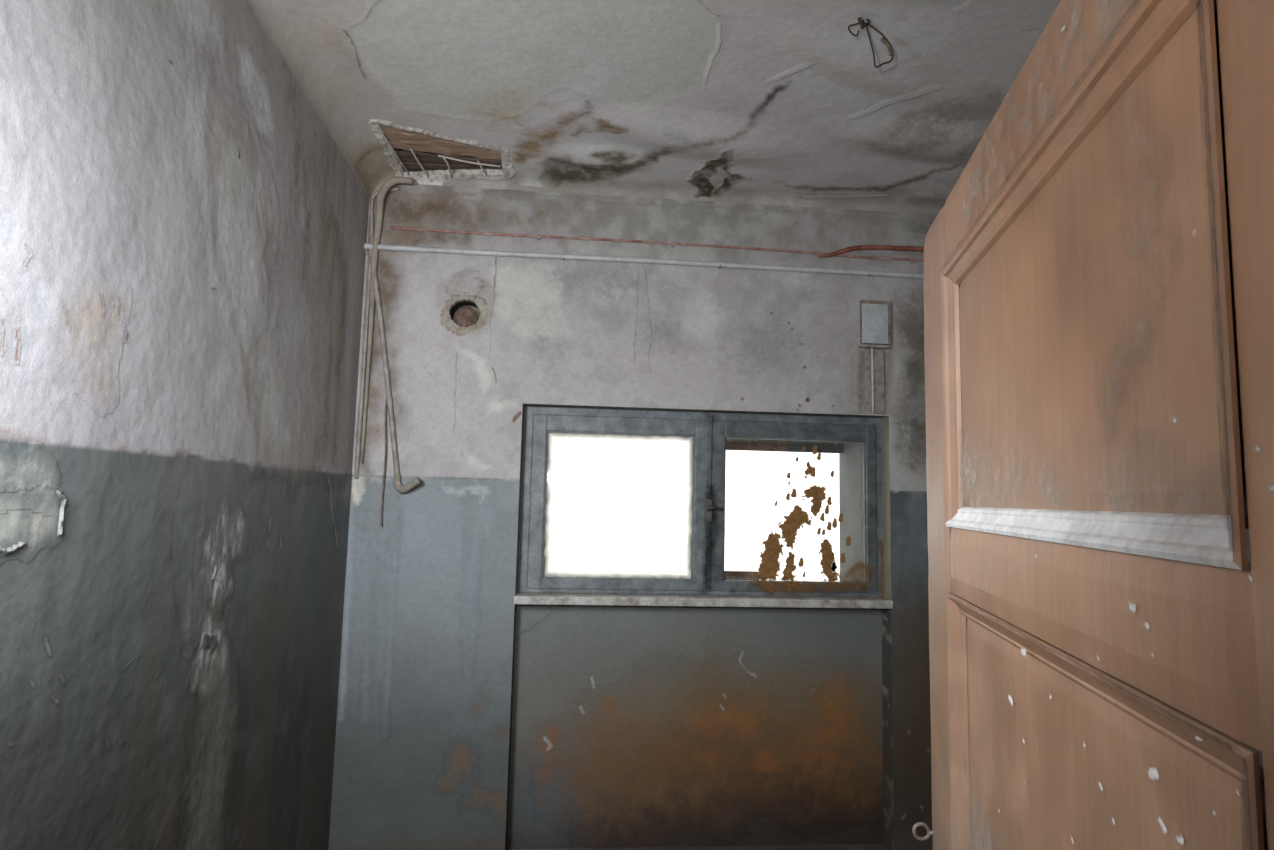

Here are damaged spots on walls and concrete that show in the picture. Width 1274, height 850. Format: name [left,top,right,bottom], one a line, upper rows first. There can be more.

peeling [345,0,730,186]
damp [468,61,816,189]
spalling [683,147,753,199]
damp [768,75,1015,247]
damp [188,37,551,502]
damp [519,245,694,388]
damp [712,300,819,391]
damp [845,279,927,489]
peeling [0,440,70,565]
damp [170,494,251,850]
rust [431,645,883,848]